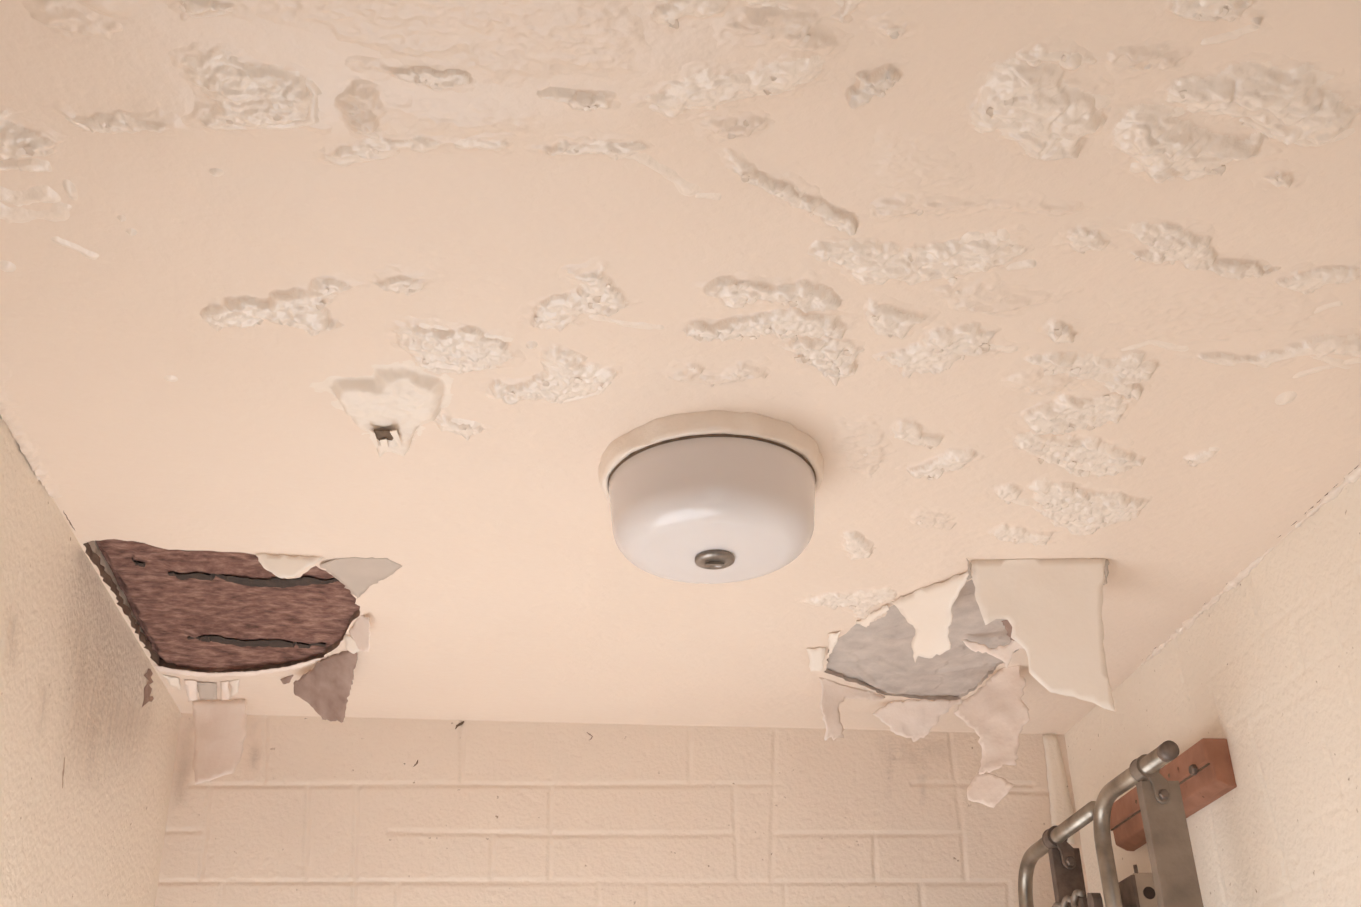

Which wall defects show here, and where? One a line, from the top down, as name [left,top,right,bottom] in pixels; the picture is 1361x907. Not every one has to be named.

peeling [309,360,480,457]
peeling [163,675,240,702]
peeling [806,558,1116,808]